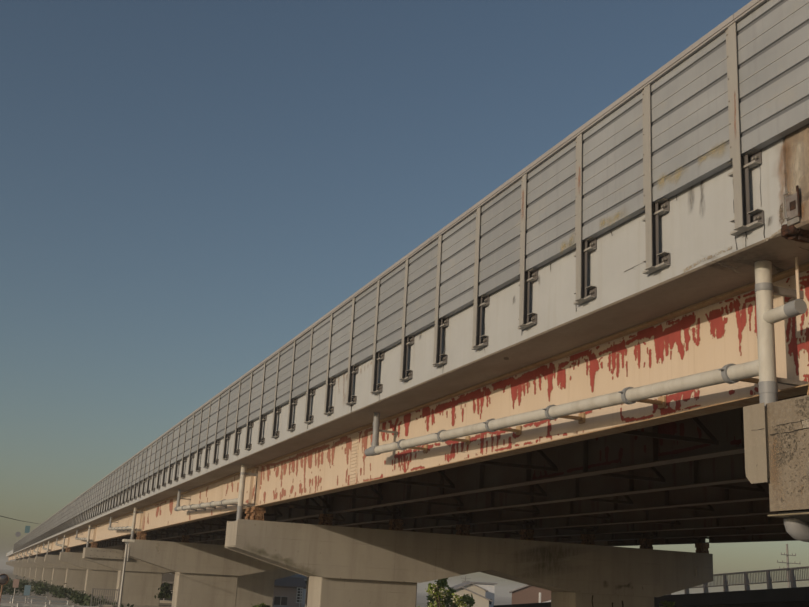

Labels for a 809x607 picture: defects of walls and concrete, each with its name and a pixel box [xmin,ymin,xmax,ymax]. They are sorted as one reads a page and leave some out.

peeling [786,271,809,382]
peeling [225,290,757,507]
spalling [772,397,809,502]